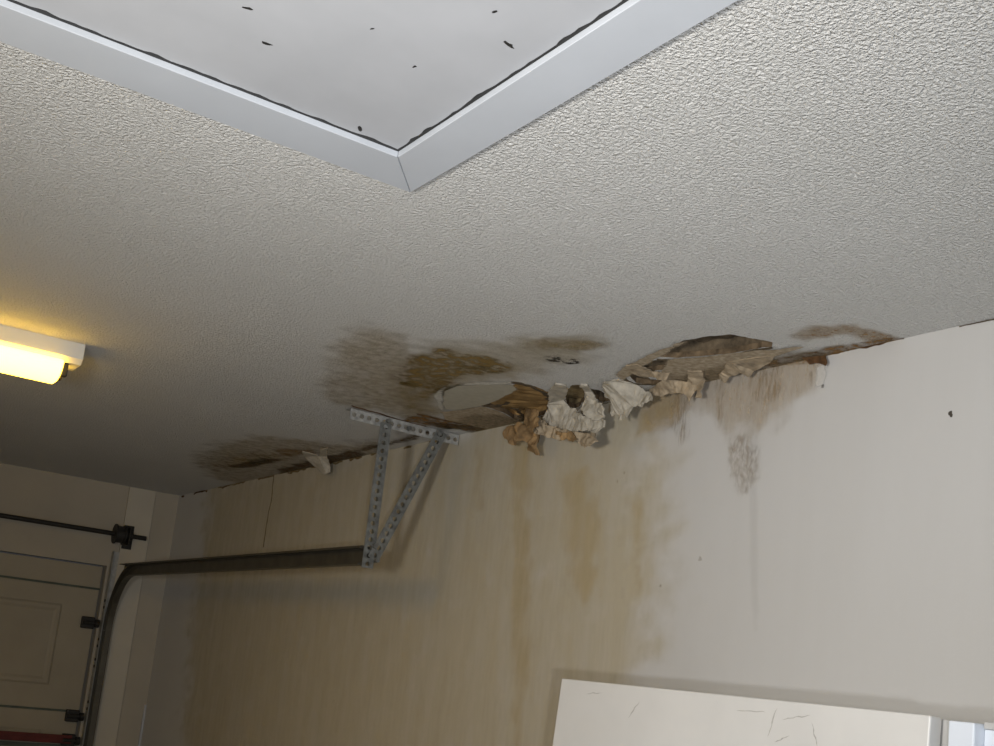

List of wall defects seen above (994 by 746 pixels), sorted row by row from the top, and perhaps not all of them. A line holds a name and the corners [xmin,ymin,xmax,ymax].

water stain [402,348,511,398]
peeling [502,342,705,455]
water stain [233,450,314,473]
water stain [327,431,429,463]